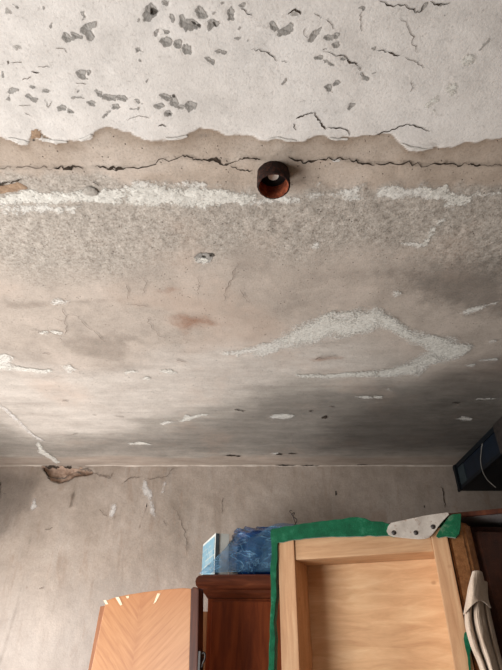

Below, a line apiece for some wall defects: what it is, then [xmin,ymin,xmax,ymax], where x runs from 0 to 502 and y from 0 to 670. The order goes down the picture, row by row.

flaking render [61,11,97,43]
flaking render [137,1,168,22]
flaking render [169,6,219,32]
crack [377,1,449,66]
flaking render [153,93,197,117]
crack [293,113,349,134]
crack [4,155,260,172]
crack [289,157,502,167]
leakage [0,180,300,215]
leakage [376,184,501,208]
leakage [222,308,473,379]
leakage [0,405,60,464]